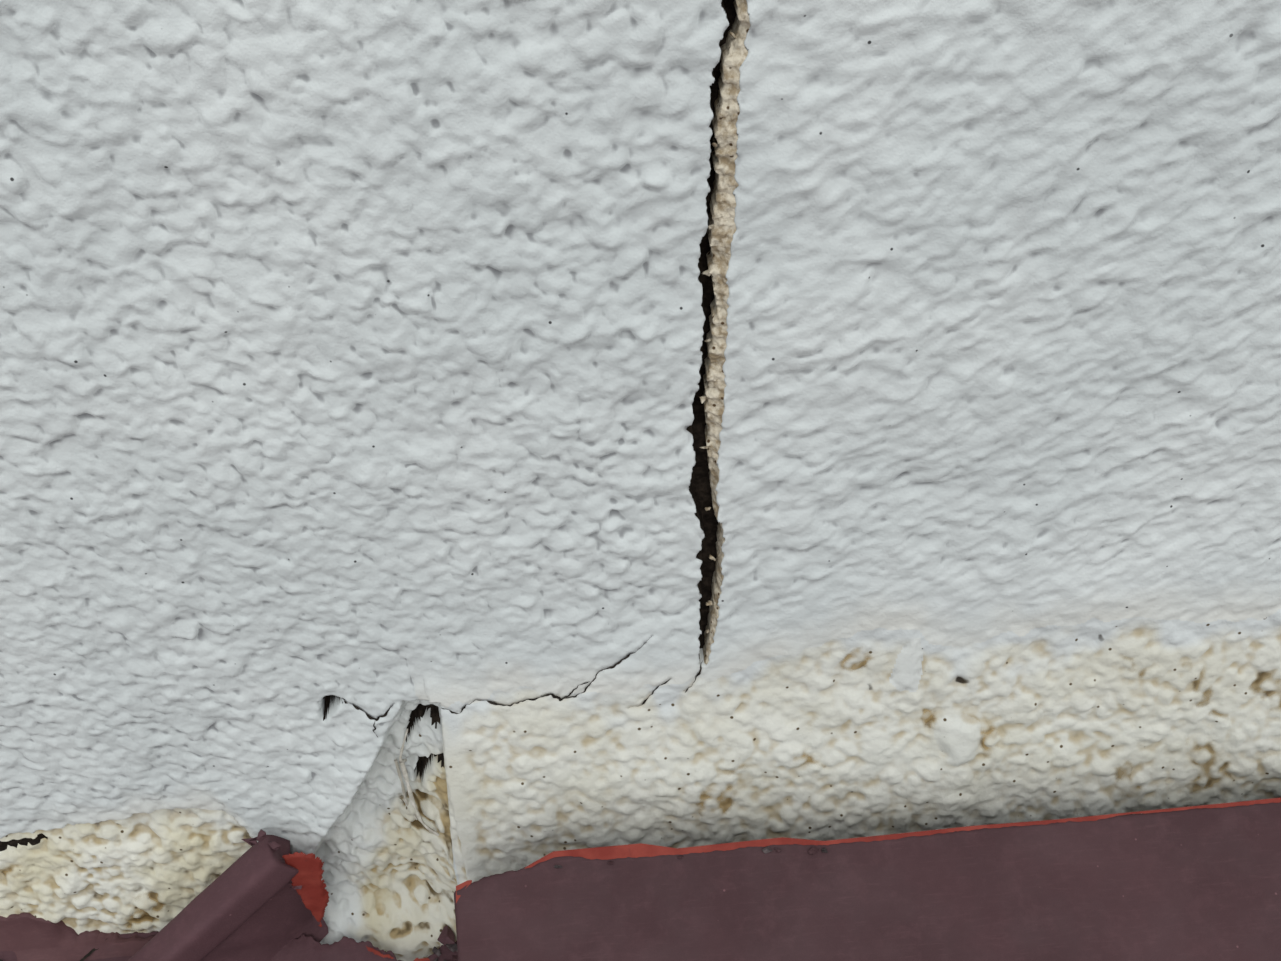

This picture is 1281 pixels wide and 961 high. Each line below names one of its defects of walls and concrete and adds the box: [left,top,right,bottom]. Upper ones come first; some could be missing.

crack [629,0,750,708]
spalling [323,695,340,721]
crack [342,698,393,737]
crack [442,636,652,714]
spalling [282,699,472,961]